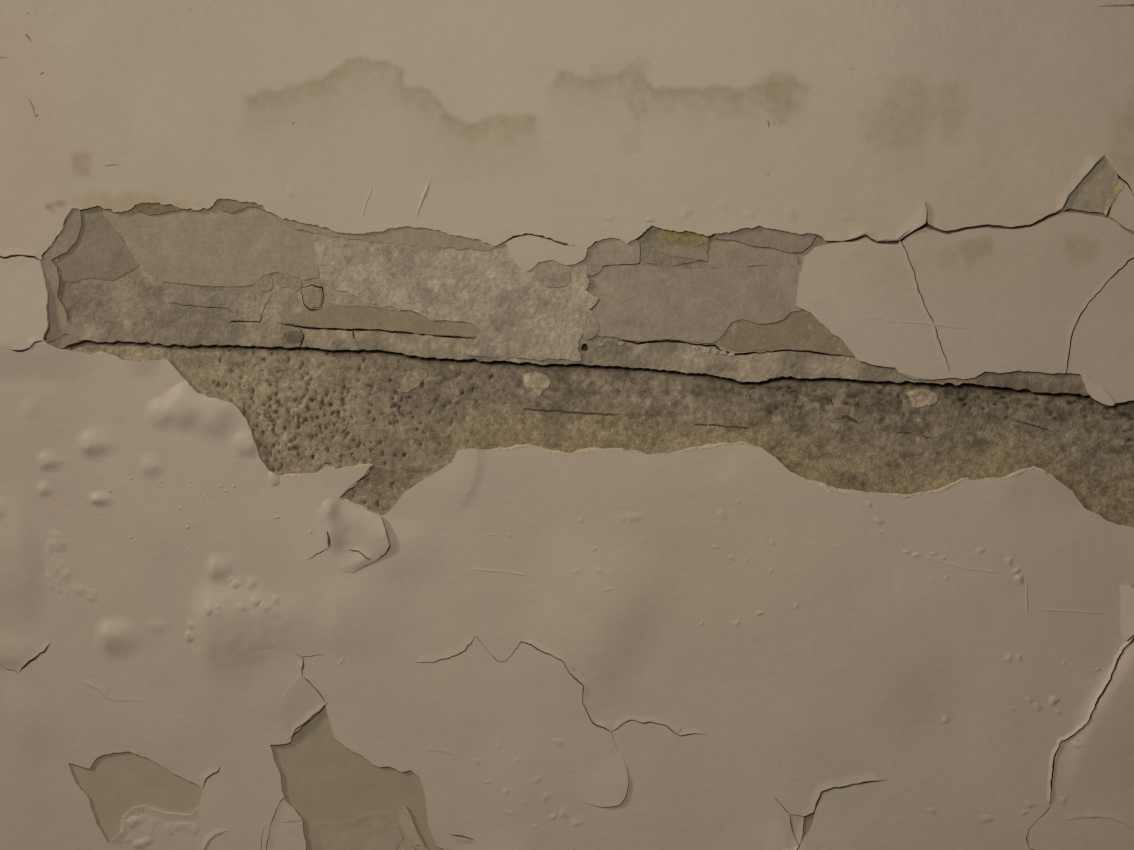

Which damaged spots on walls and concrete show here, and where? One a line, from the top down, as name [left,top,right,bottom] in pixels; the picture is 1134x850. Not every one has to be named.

flaking render [0,156,1134,573]
crack [841,211,1064,372]
crack [1063,252,1134,373]
spalling [70,751,214,850]
spalling [270,695,444,850]
crack [414,636,475,663]
crack [494,638,707,737]
crack [786,772,888,812]
crack [1026,635,1134,848]
peeling [1120,584,1134,640]